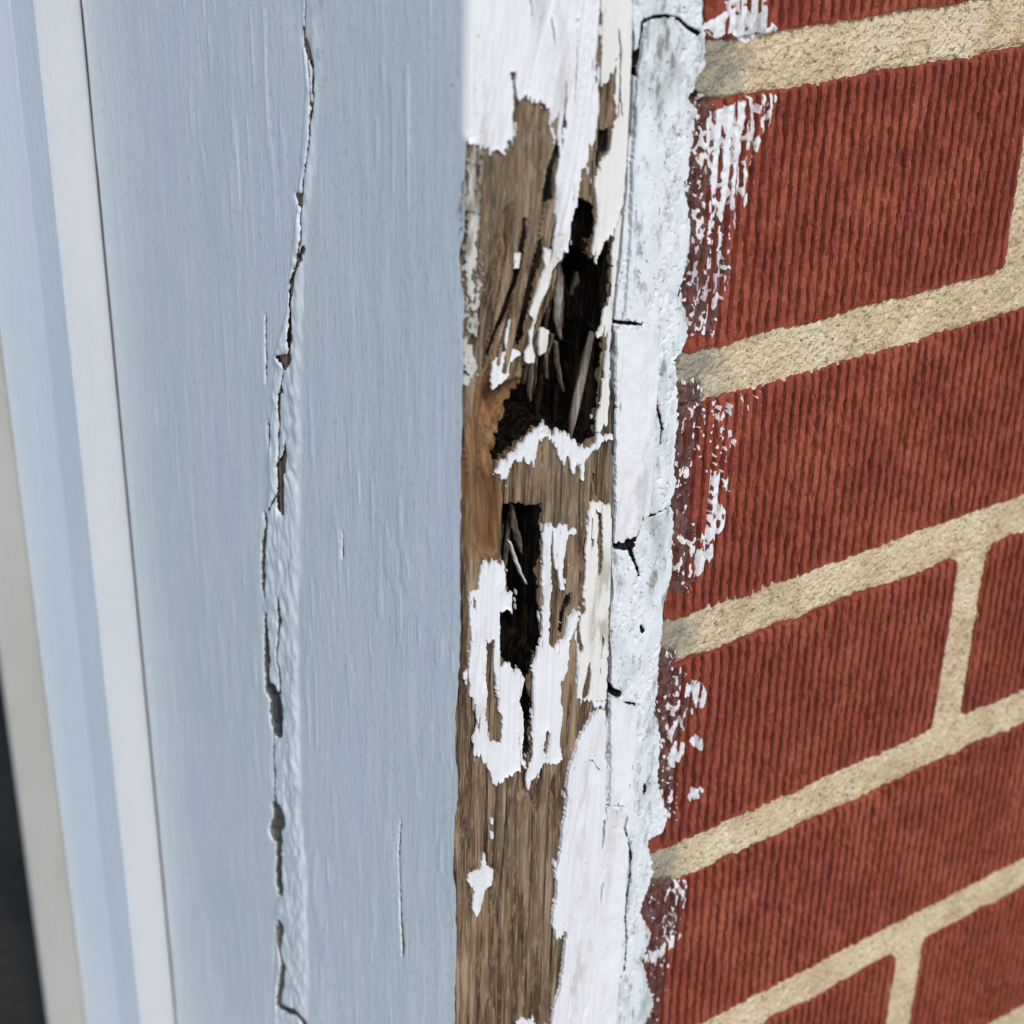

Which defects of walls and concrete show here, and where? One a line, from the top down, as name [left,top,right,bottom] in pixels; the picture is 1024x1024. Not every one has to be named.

crack [631,14,700,77]
peeling [705,100,747,212]
peeling [459,0,633,488]
crack [261,0,314,1024]
crack [612,508,666,577]
peeling [687,682,707,708]
peeling [462,500,638,1024]
peeling [667,734,703,768]
peeling [687,786,704,801]
peeling [644,932,681,963]